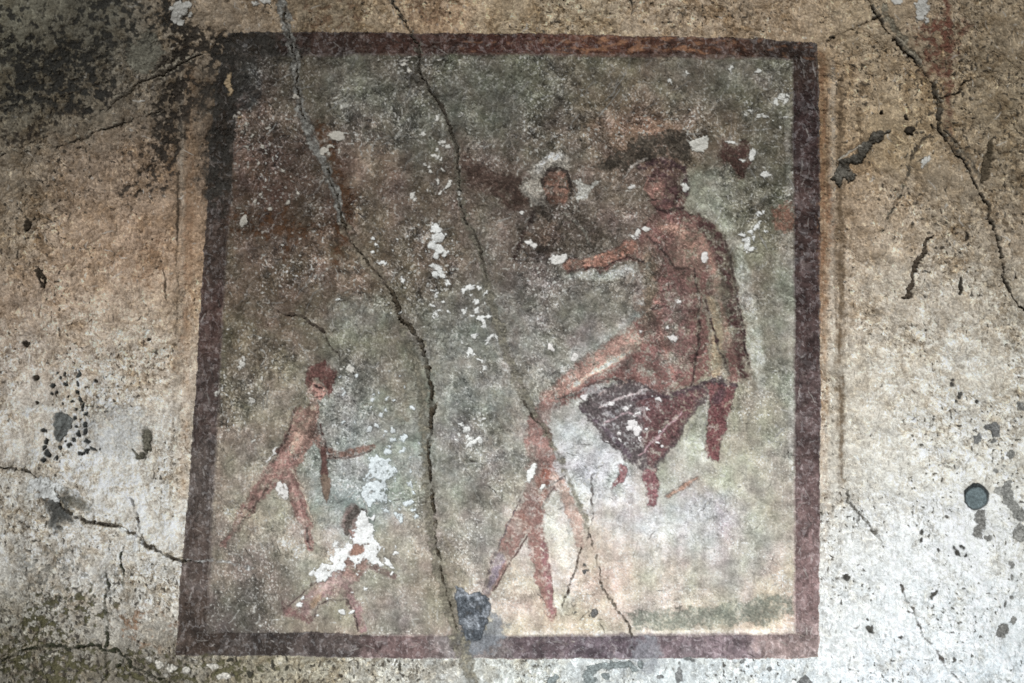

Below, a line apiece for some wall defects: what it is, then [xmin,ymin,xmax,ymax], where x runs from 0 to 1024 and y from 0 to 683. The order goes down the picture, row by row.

crack [0,53,202,155]
water stain [0,0,303,241]
flaking render [830,130,891,187]
crack [866,3,1024,311]
crack [276,0,479,683]
peeling [425,223,498,373]
crack [390,0,633,638]
peeling [309,392,420,583]
crack [2,492,250,681]
flaking render [455,586,505,656]